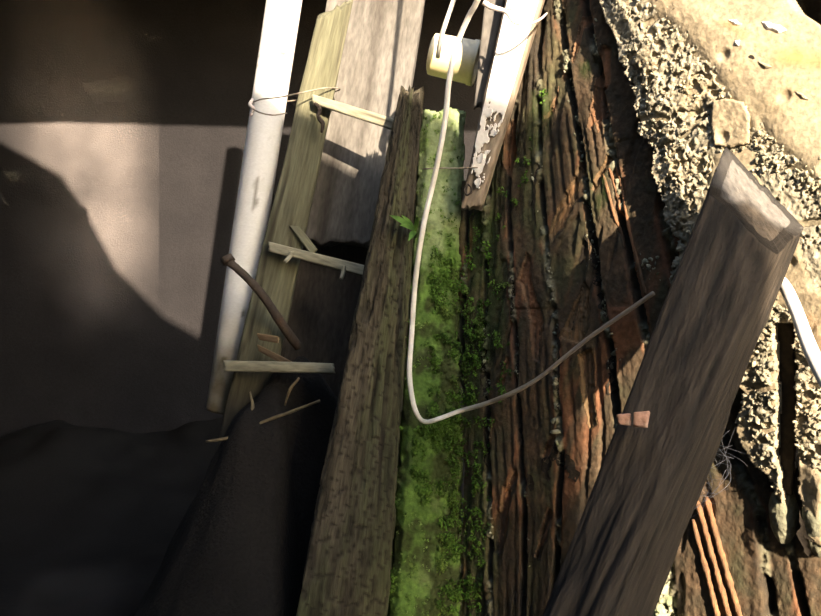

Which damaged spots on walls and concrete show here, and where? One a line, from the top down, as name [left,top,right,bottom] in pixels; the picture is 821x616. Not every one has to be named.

peeling [471,0,539,189]
spalling [537,0,821,294]
spalling [735,298,821,501]